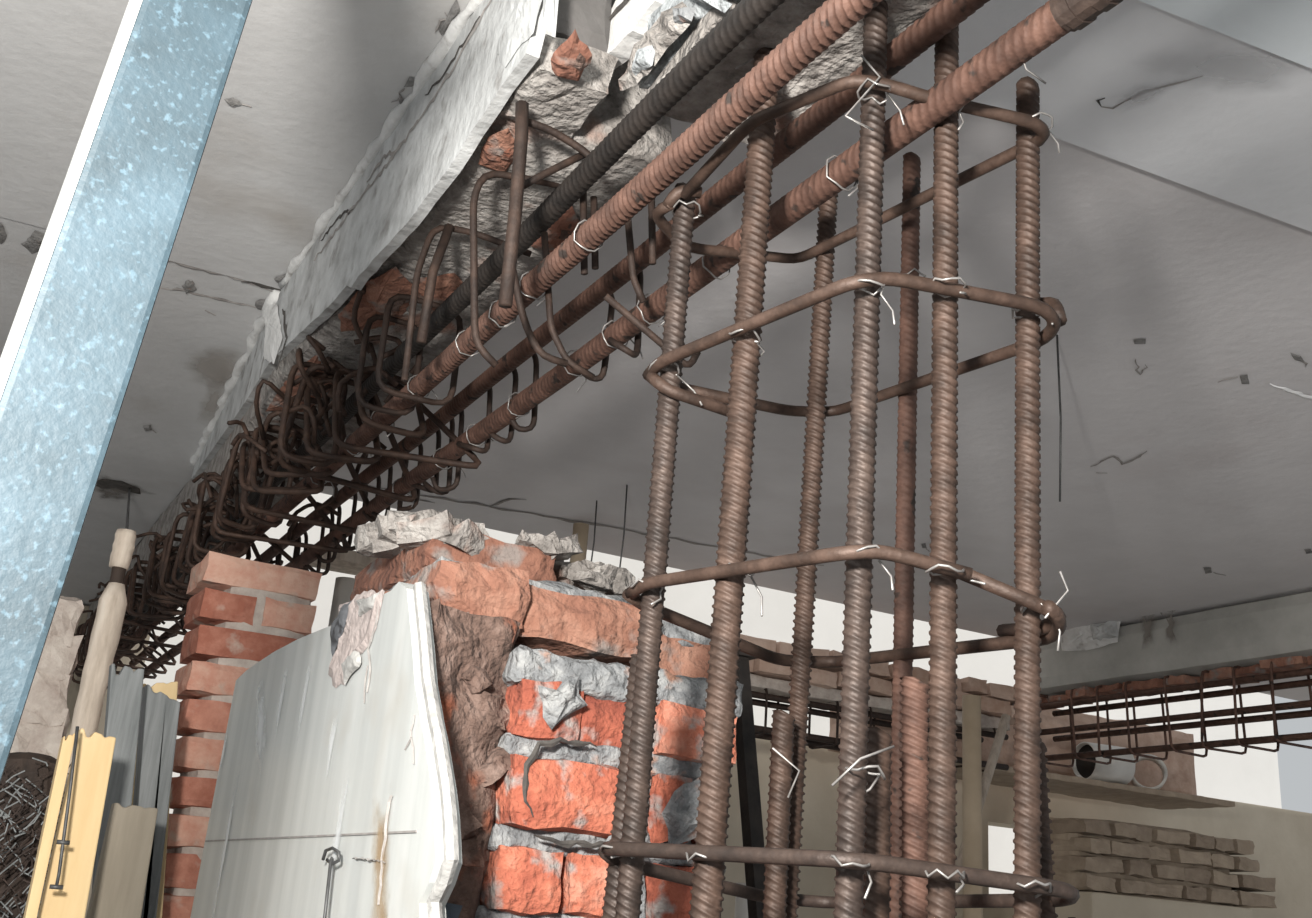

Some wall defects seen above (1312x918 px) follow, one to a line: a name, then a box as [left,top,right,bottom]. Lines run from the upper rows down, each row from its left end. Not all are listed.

spalling [435,0,460,35]
flaking render [496,0,542,67]
flaking render [551,30,593,81]
spalling [618,0,732,91]
spalling [391,77,415,104]
crack [1096,76,1203,109]
flaking render [478,128,514,171]
flaking render [531,206,580,253]
spalling [182,280,197,294]
flaking render [338,267,463,332]
flaking render [255,299,332,412]
peeling [328,589,385,688]